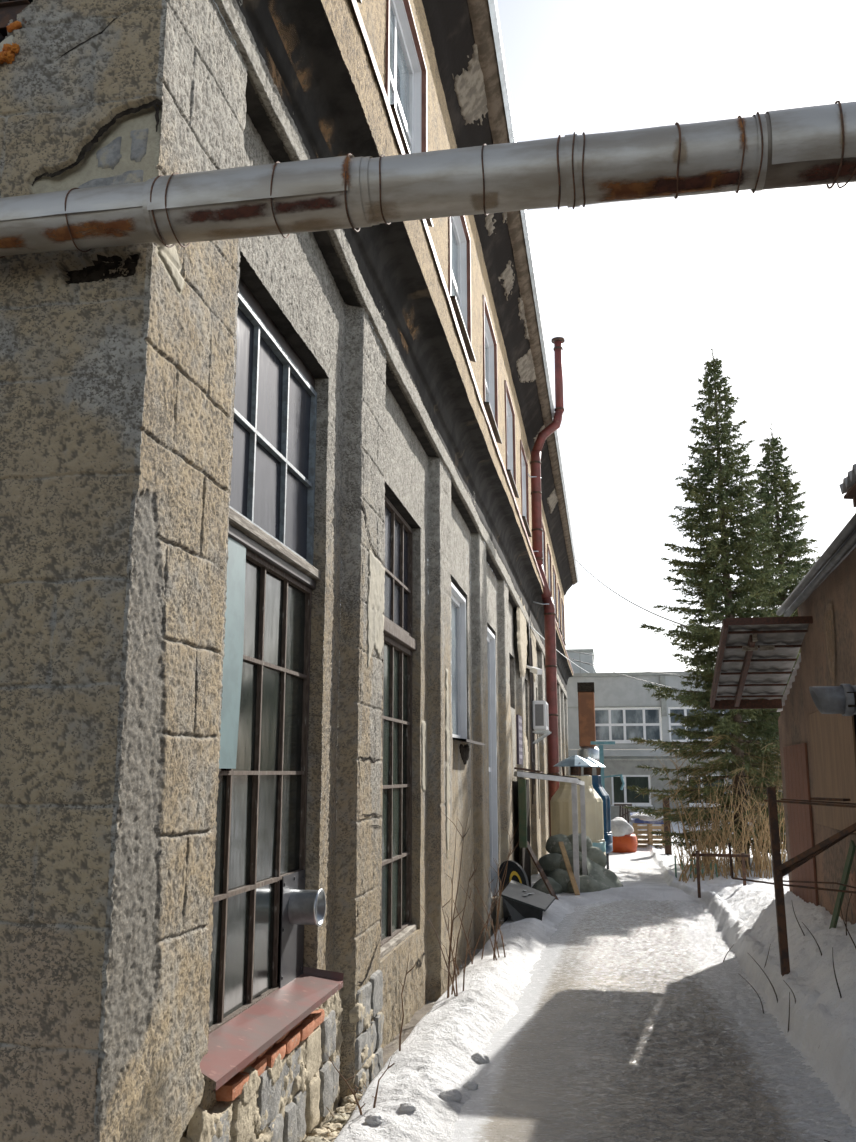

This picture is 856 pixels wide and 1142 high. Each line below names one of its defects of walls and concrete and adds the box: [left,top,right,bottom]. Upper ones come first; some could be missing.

peeling [452,44,488,126]
spalling [78,128,149,189]
corrosion [799,162,856,182]
corrosion [600,170,744,202]
corrosion [187,197,339,222]
corrosion [0,237,24,249]
corrosion [45,219,133,242]